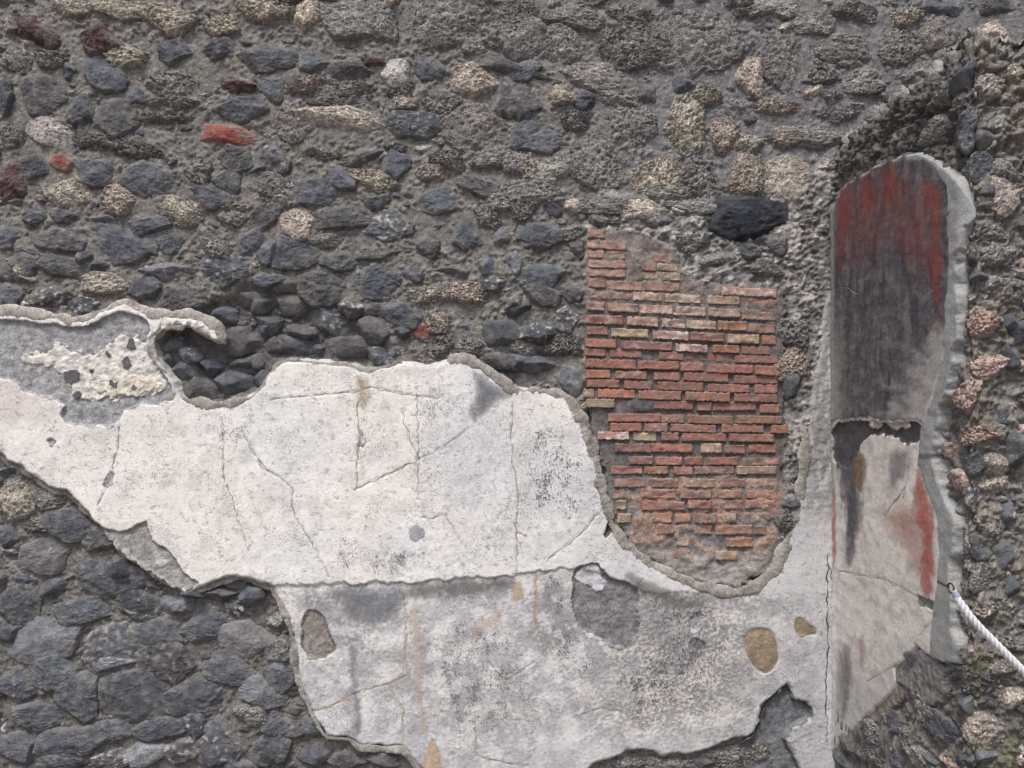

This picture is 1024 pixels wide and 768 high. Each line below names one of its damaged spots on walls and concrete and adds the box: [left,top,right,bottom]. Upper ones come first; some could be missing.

spalling [0,311,209,427]
crack [97,427,119,506]
spalling [105,521,200,592]
crack [222,419,329,577]
crack [271,377,466,543]
crack [489,405,602,722]
water stain [838,441,862,562]
spalling [831,419,921,469]
spalling [300,610,336,660]
crack [789,556,919,745]
spalling [739,687,814,768]